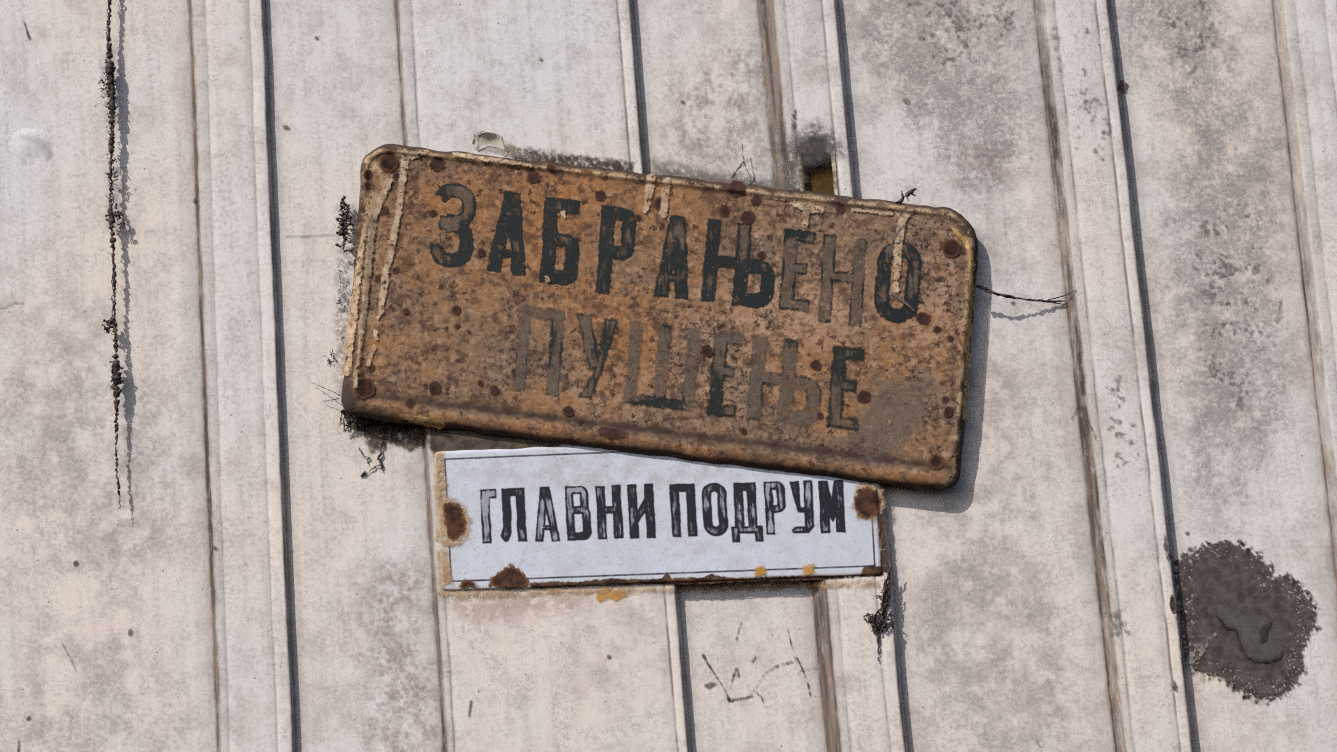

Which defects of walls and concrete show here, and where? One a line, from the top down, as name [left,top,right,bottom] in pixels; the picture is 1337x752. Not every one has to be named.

water stain [1172,537,1322,705]